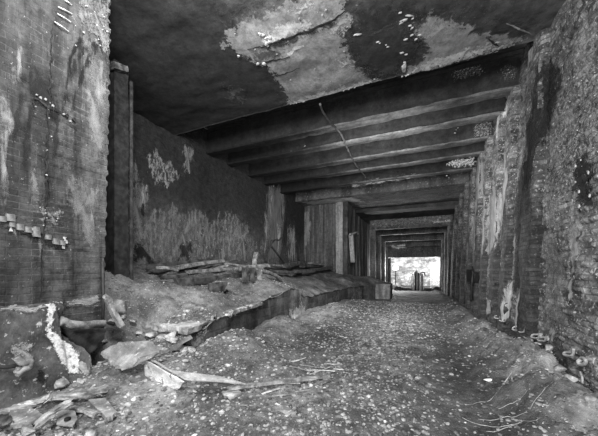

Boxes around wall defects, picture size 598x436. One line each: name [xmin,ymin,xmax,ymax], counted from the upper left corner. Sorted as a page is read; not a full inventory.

damp [63,37,82,99]
damp [72,42,98,110]
peeling [220,0,381,105]
damp [4,93,34,164]
peeling [147,144,194,188]
peeling [128,159,264,263]
damp [500,32,598,329]
spalling [44,303,79,374]